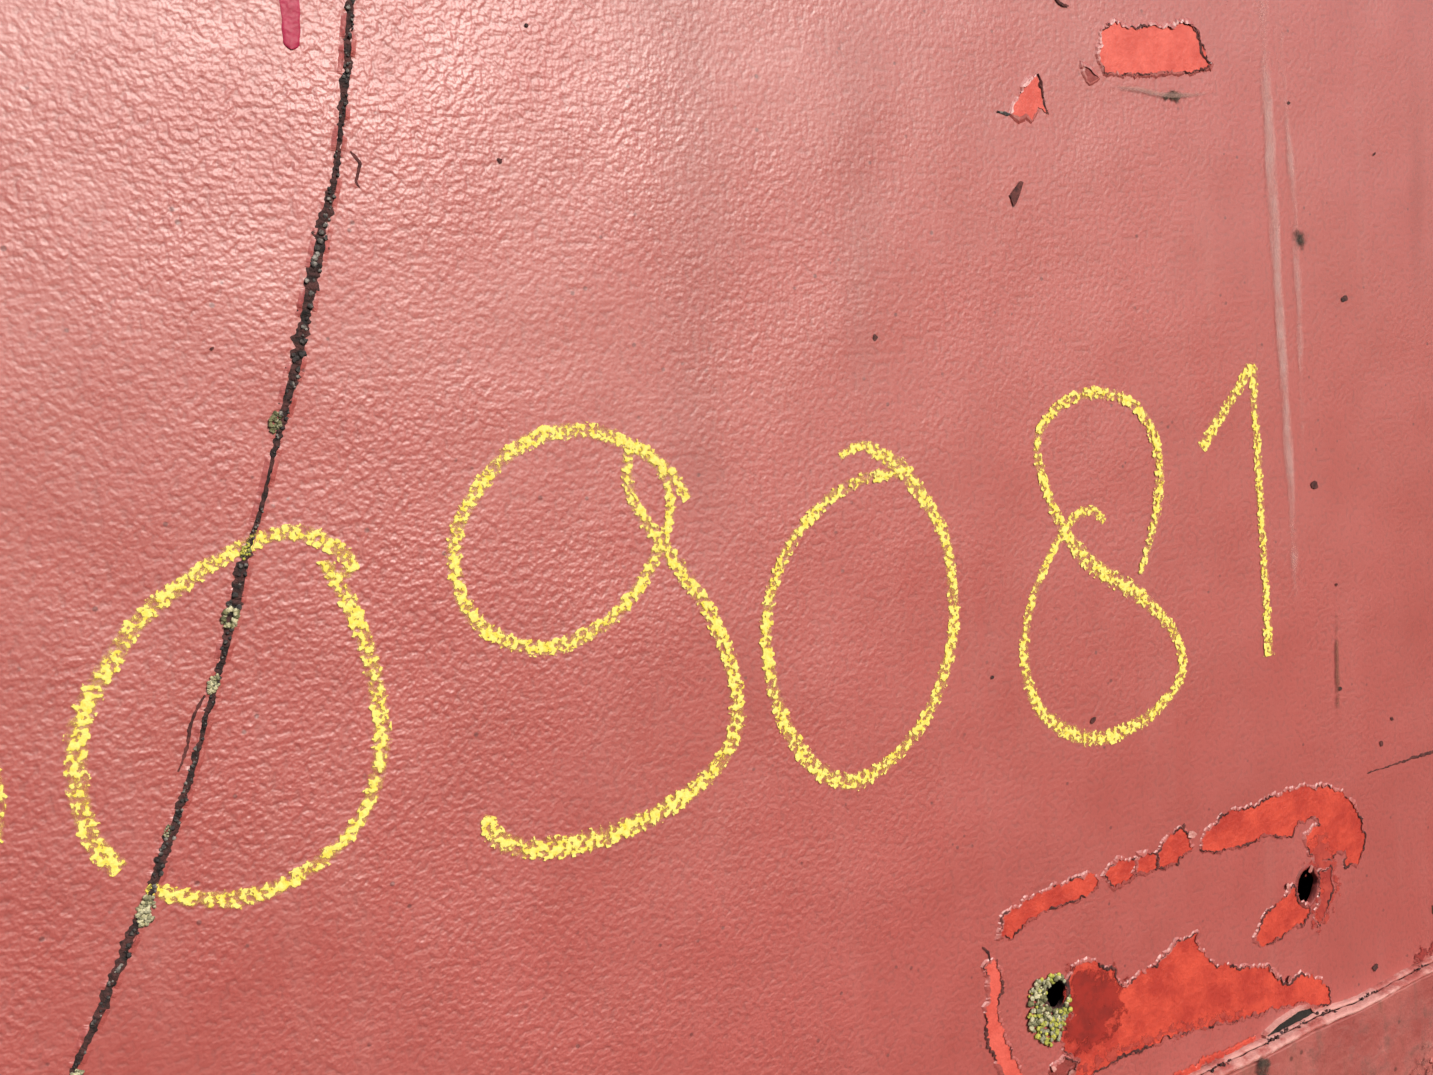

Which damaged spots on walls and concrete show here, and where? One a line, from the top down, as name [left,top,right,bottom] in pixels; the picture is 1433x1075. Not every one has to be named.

peeling [1079,17,1214,86]
peeling [997,73,1049,124]
crack [66,0,362,1073]
crack [1367,750,1433,774]
peeling [980,781,1367,1075]